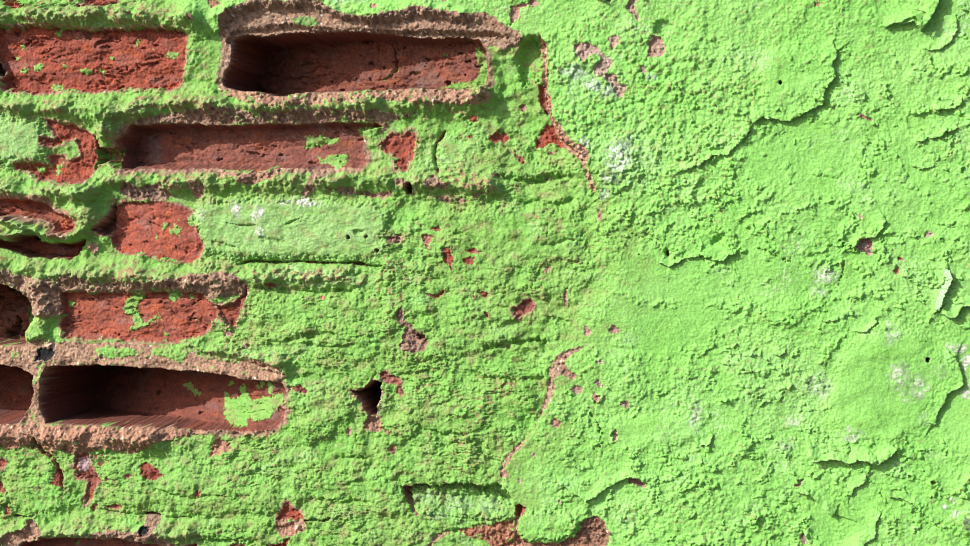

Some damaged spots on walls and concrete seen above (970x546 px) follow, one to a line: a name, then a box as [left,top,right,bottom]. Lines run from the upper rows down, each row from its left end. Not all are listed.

spalling [535,33,597,194]
spalling [0,0,540,517]
spalling [500,326,605,484]
peeling [0,512,175,546]
flaking render [267,501,306,546]
flaking render [428,504,612,546]